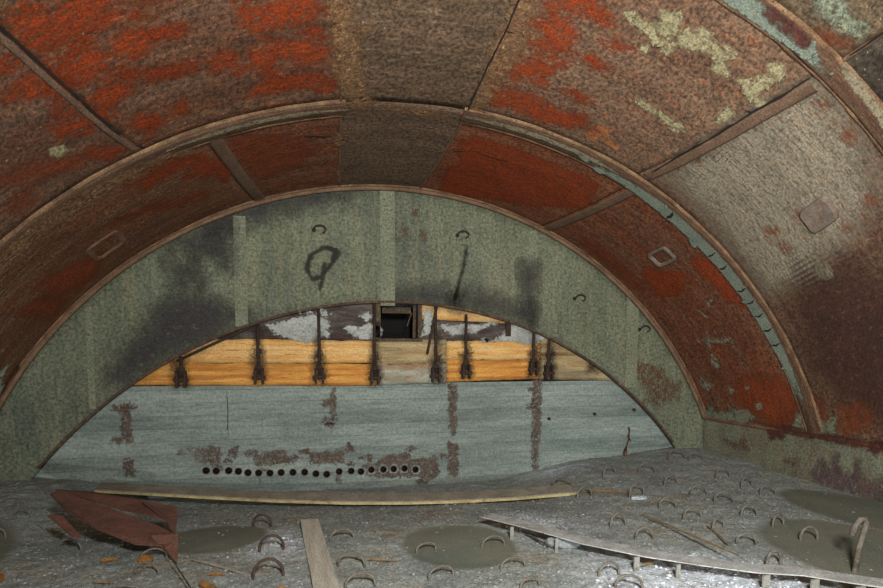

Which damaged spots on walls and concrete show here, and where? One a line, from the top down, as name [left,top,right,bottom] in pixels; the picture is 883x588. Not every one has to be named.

corrosion [0,0,341,157]
peeling [166,0,375,152]
crack [467,0,520,112]
corrosion [477,0,635,131]
peeling [723,0,883,128]
peeling [466,0,803,401]
peeling [665,81,876,294]
leakage [111,193,339,377]
peeling [420,310,545,346]
corrosion [637,362,681,407]
corrosion [690,256,749,310]